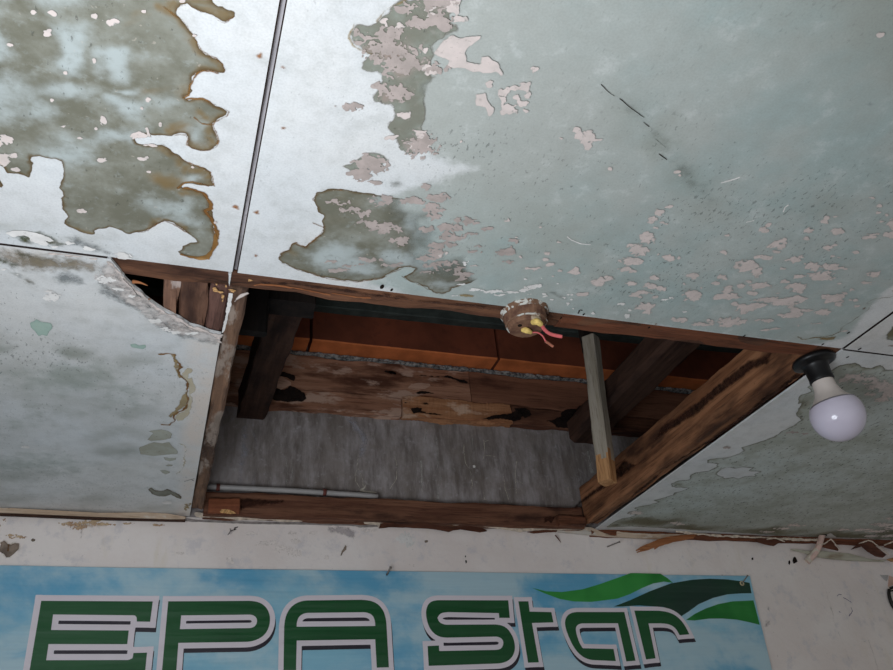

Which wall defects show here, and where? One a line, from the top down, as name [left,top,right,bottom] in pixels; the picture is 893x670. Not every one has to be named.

peeling [353,0,539,119]
peeling [335,102,364,112]
leakage [0,0,235,260]
peeling [384,129,442,160]
peeling [572,127,603,150]
peeling [324,153,881,331]
leakage [0,252,94,282]
spalling [6,230,223,343]
leakage [139,430,185,474]
leakage [148,488,181,499]